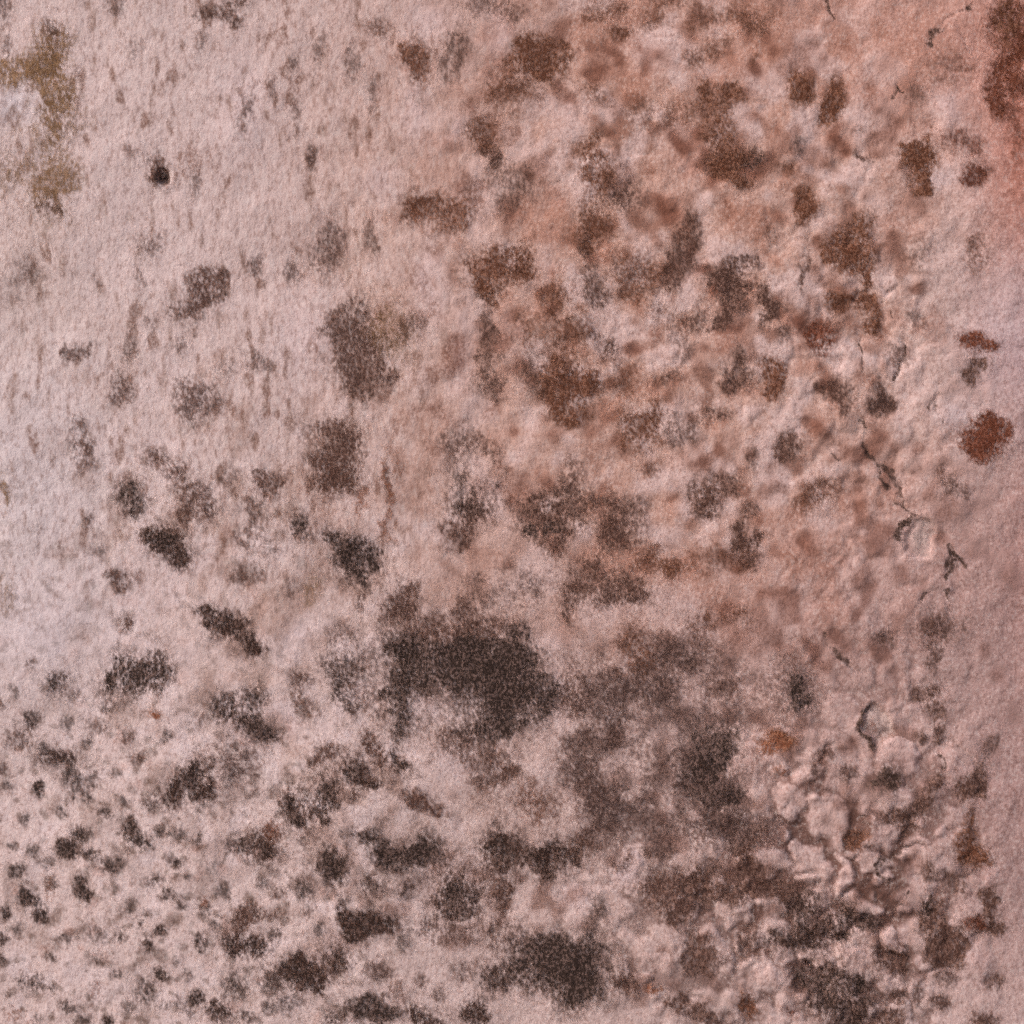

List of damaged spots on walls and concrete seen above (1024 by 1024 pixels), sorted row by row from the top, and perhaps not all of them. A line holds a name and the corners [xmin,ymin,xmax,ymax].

leakage [661,208,789,338]
leakage [139,447,220,569]
leakage [516,459,651,627]
crack [859,420,912,514]
crack [921,543,967,600]
corrosion [958,410,1014,465]
leakage [106,650,175,694]
crack [823,632,849,666]
leakage [143,688,278,810]
leakage [225,580,1006,1024]
leakage [0,826,125,966]
leakage [166,900,409,1023]